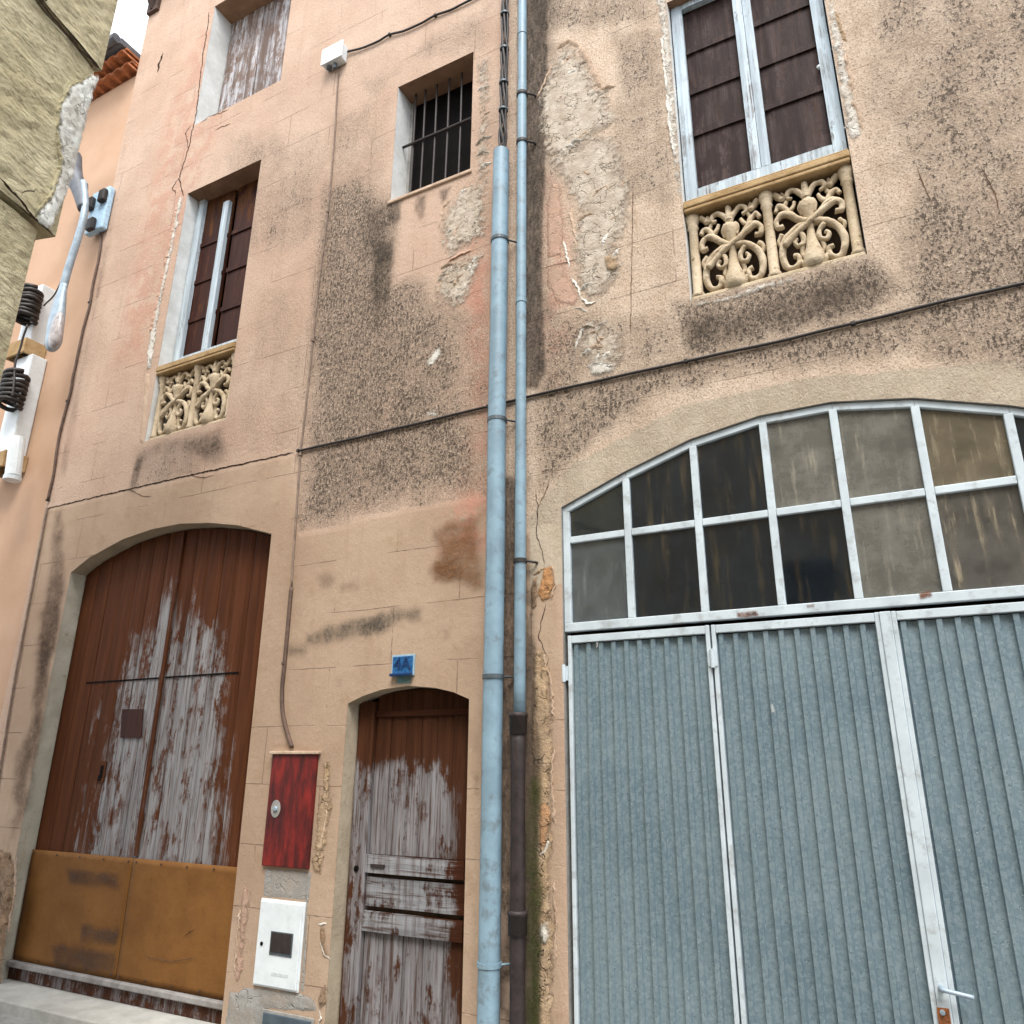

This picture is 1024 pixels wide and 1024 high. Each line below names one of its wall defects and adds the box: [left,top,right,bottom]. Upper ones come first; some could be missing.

flaking render [35,74,99,228]
flaking render [147,198,182,369]
crack [172,12,228,196]
flaking render [434,57,492,307]
flaking render [537,39,631,377]
flaking render [829,3,863,138]
water stain [433,524,478,584]
crack [535,483,549,565]
flaking render [531,565,556,613]
flaking render [531,646,558,1024]